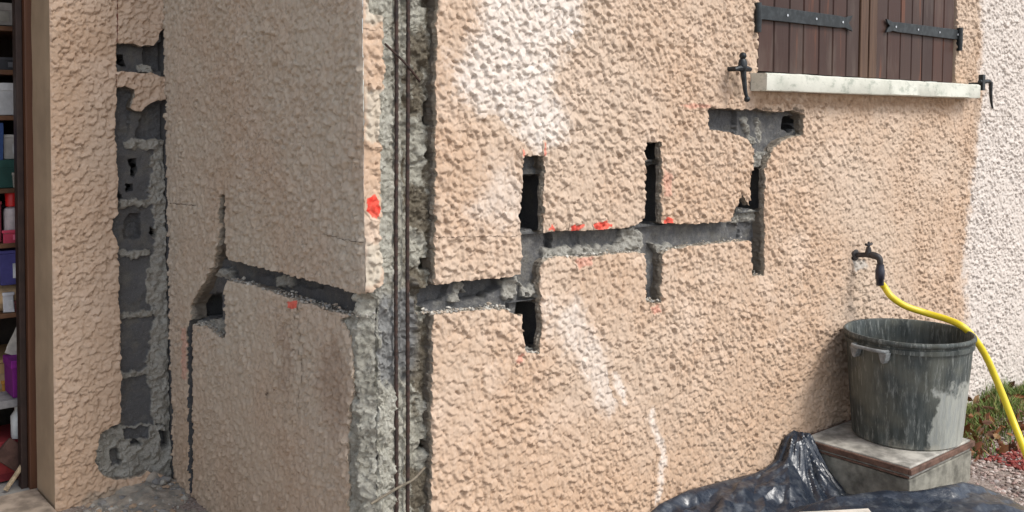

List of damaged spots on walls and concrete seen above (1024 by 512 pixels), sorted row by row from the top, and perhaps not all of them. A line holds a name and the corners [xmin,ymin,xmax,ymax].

spalling [116,32,161,76]
spalling [341,0,439,512]
spalling [159,430,170,450]
spalling [95,447,167,480]